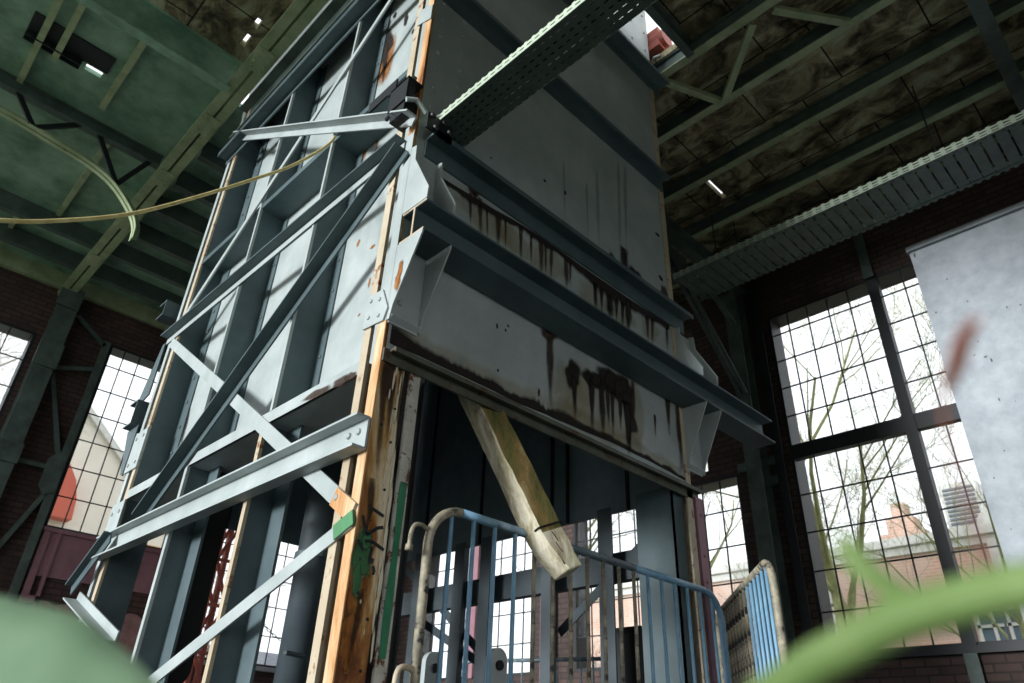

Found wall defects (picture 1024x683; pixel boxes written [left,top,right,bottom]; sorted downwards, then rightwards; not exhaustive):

corrosion [378,12,414,82]
corrosion [443,178,670,345]
corrosion [390,325,685,480]